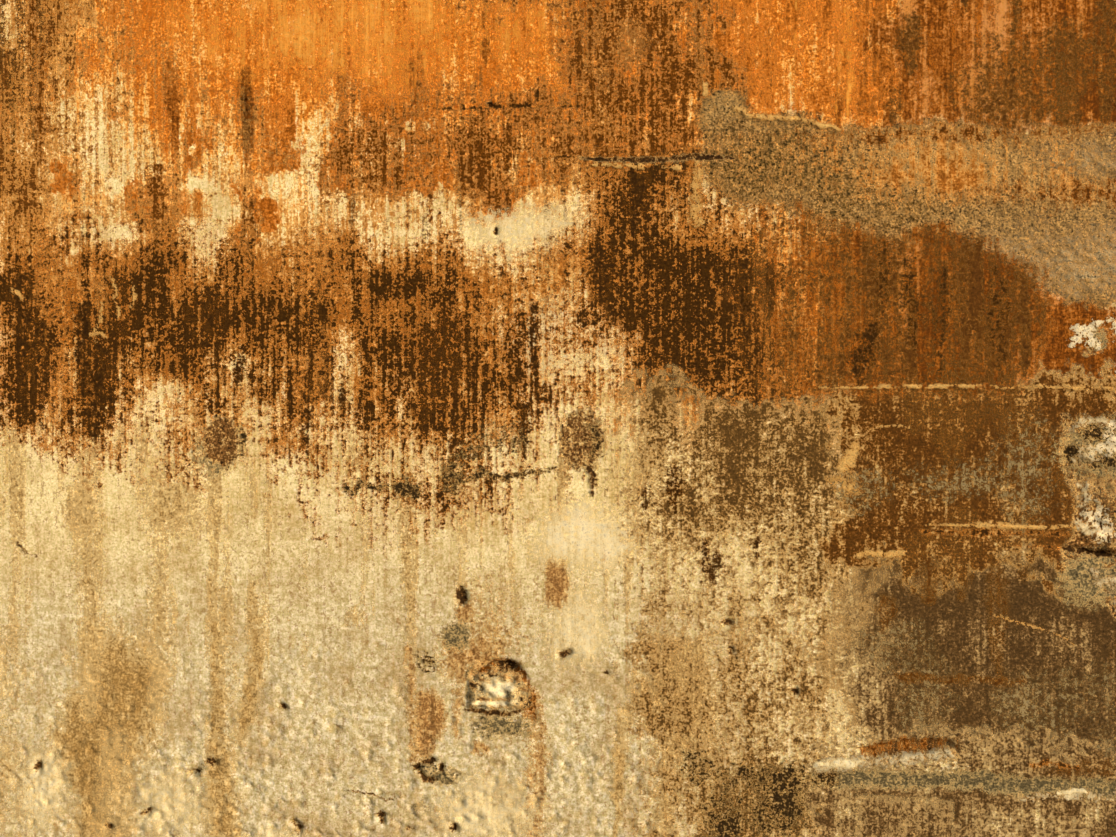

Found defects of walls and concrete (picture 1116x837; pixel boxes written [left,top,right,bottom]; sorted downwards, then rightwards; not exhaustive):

corrosion [0,0,1116,462]
flaking render [687,81,1116,352]
crack [1015,544,1116,559]
crack [813,735,960,774]